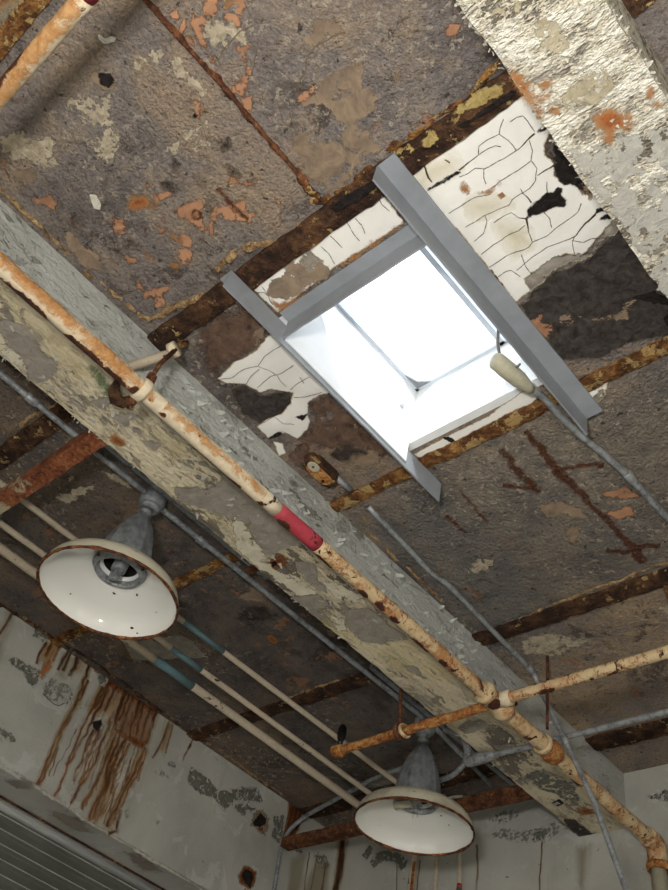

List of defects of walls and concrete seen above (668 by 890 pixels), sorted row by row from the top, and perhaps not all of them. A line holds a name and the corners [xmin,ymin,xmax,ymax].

peeling [134,49,207,118]
corrosion [142,0,322,205]
peeling [292,0,668,363]
crack [424,116,600,278]
spalling [214,240,276,273]
crack [217,345,322,398]
peeling [413,383,542,458]
peeling [589,382,608,403]
corrosion [499,449,541,493]
corrosion [524,430,661,564]
corrosion [36,642,172,835]